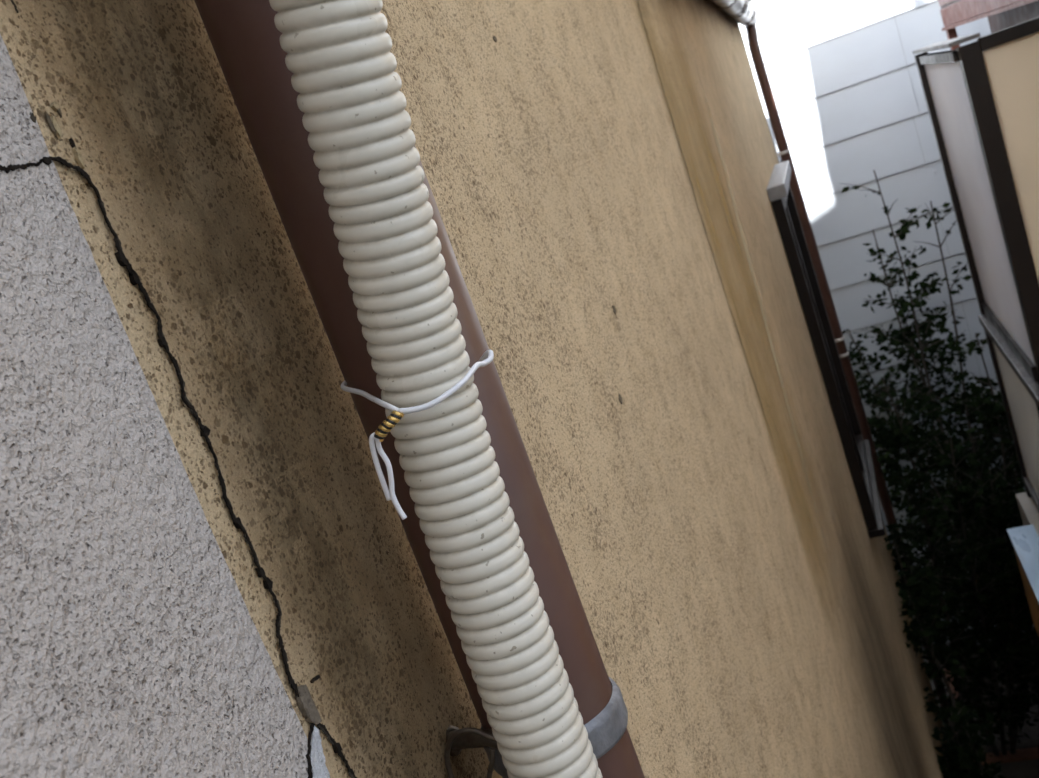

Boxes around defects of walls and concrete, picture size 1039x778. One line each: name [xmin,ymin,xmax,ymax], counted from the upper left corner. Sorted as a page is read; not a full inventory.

crack [0,156,357,778]
spalling [310,726,330,778]